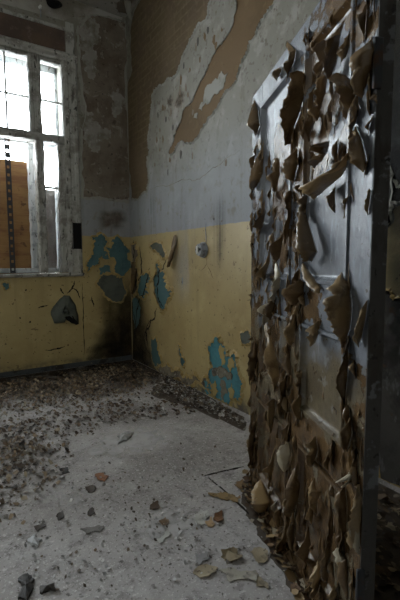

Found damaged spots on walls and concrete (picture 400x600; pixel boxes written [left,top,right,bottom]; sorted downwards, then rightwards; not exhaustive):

flaking render [76,0,277,204]
peeling [150,5,374,433]
peeling [388,166,400,227]
peeling [83,231,176,328]
peeling [246,411,256,469]
peeling [340,418,352,452]
peeling [379,287,400,488]
peeling [234,442,300,539]
peeling [308,457,362,600]